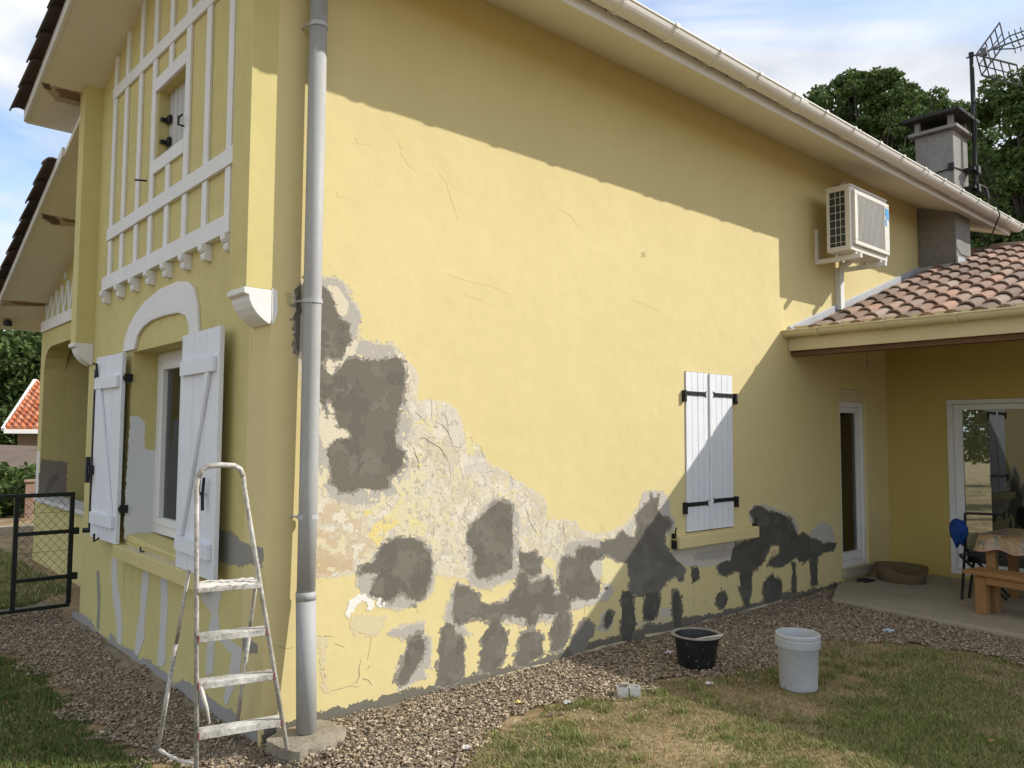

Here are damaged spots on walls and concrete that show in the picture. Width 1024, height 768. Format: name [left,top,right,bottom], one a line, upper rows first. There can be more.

flaking render [327,285,349,316]
flaking render [323,339,358,375]
flaking render [319,403,349,448]
flaking render [405,362,464,451]
crack [406,402,566,554]
peeling [316,501,376,577]
flaking render [672,540,741,568]
flaking render [808,521,835,544]
flaking render [636,616,672,629]
crack [323,636,372,691]